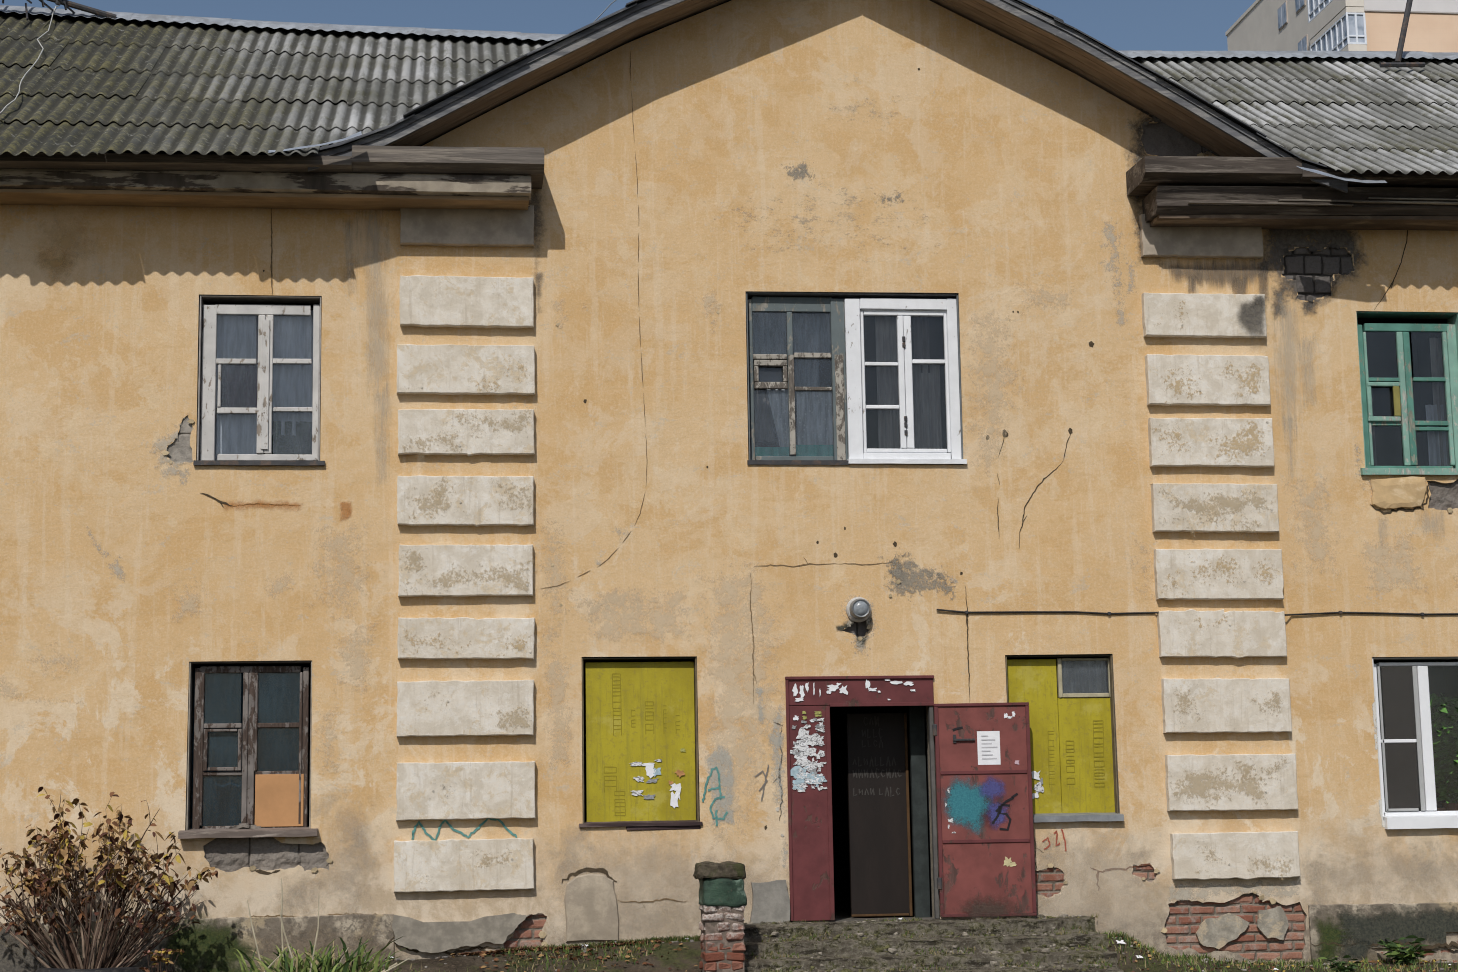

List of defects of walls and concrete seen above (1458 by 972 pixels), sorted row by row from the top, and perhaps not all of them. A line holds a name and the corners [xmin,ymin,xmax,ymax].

damp [1169,258,1286,315]
flaking render [1281,243,1354,302]
crack [1374,230,1408,310]
crack [541,53,647,589]
crack [201,493,301,508]
crack [997,434,1071,547]
spalling [1428,479,1458,513]
flaking render [204,823,333,873]
flaking render [503,913,547,949]
flaking render [1035,863,1068,898]
flaking render [1132,850,1305,963]
damp [1319,907,1458,961]